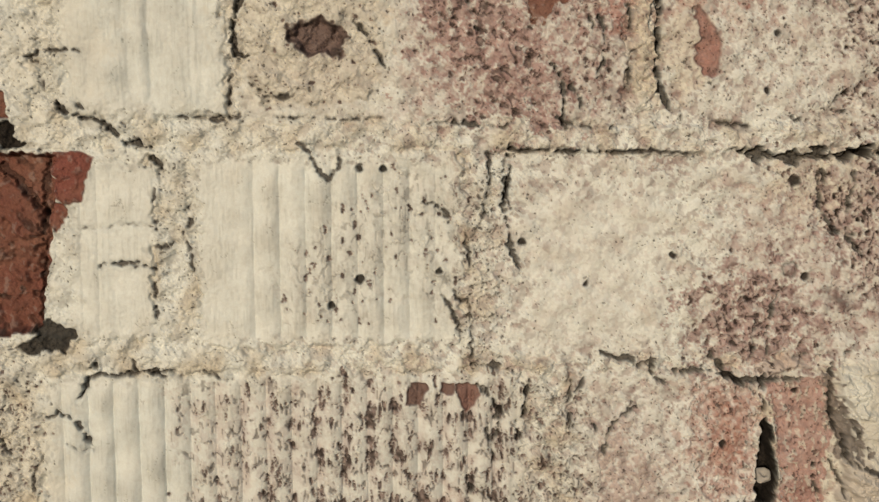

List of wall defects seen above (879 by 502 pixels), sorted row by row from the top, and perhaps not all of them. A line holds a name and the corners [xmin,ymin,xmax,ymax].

peeling [0,88,12,121]
crack [0,0,392,335]
peeling [204,0,403,143]
peeling [379,0,655,147]
crack [416,0,879,464]
peeling [692,4,726,82]
peeling [760,0,879,154]
spalling [0,148,98,502]
crack [0,350,236,502]
crack [463,474,477,502]
peeling [142,123,879,502]
crack [564,285,879,502]